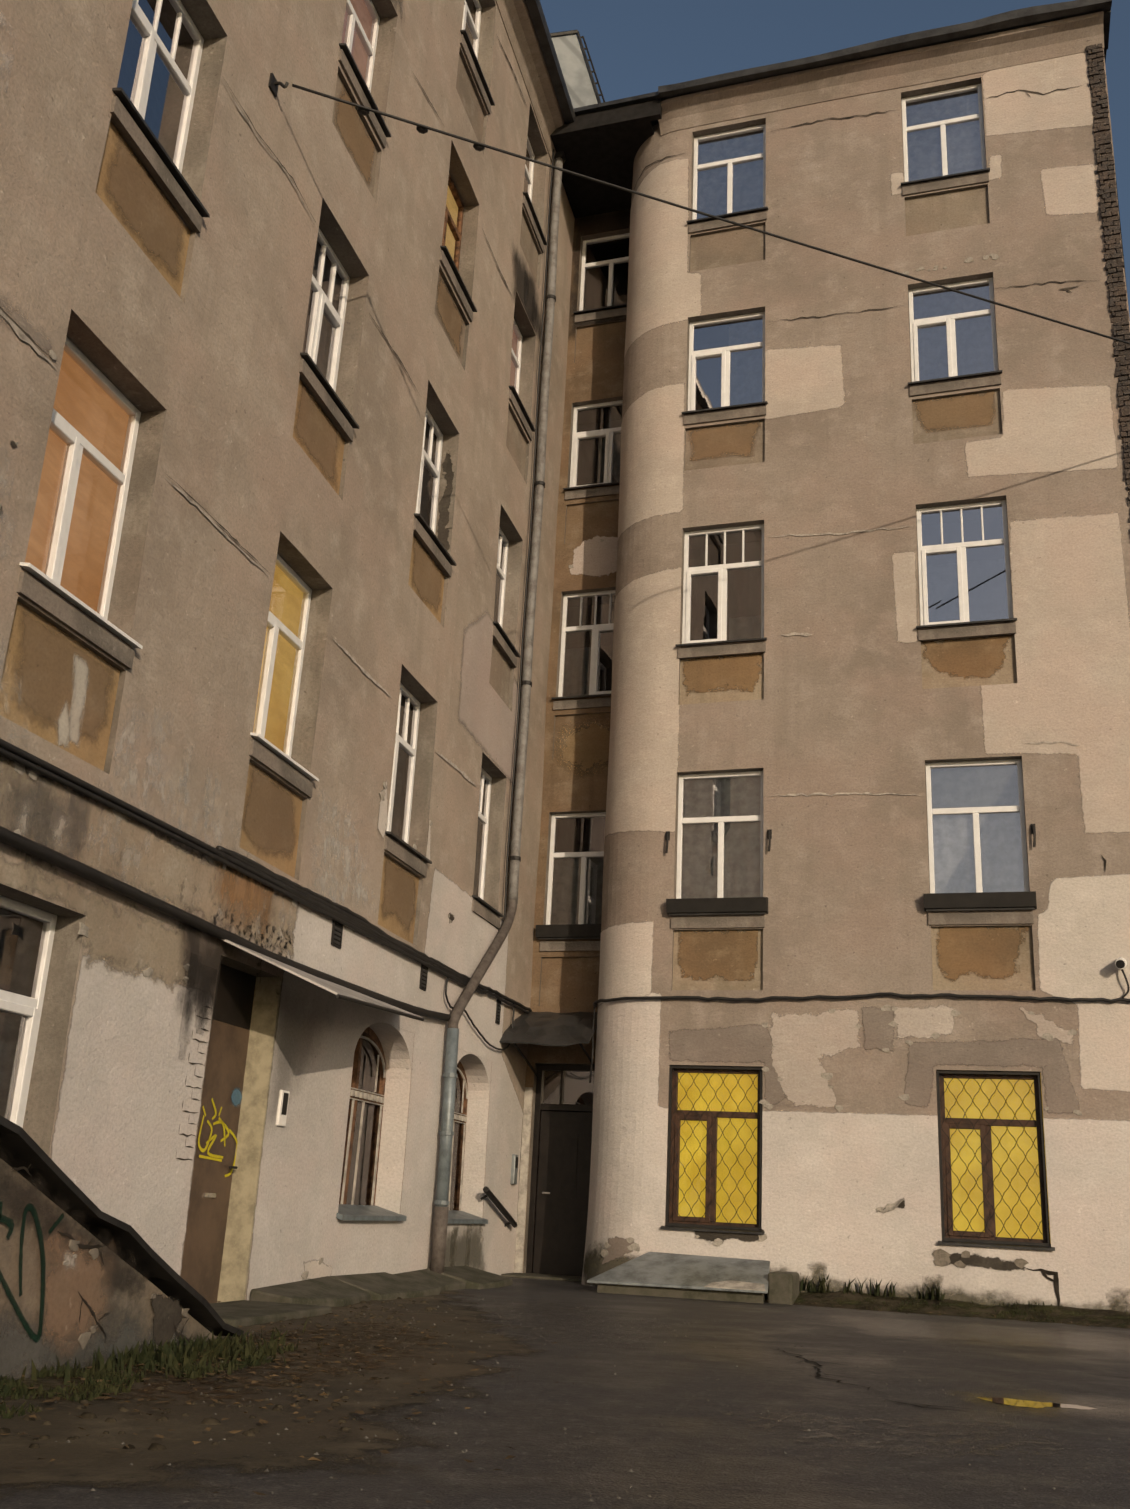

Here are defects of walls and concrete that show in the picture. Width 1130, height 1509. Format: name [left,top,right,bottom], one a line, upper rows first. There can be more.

crack [989,85,1082,98]
crack [771,110,895,132]
crack [995,280,1097,292]
crack [769,305,903,322]
crack [0,306,57,369]
peeling [1020,1007,1077,1044]
peeling [769,1004,961,1112]
flaking render [932,1249,1028,1271]